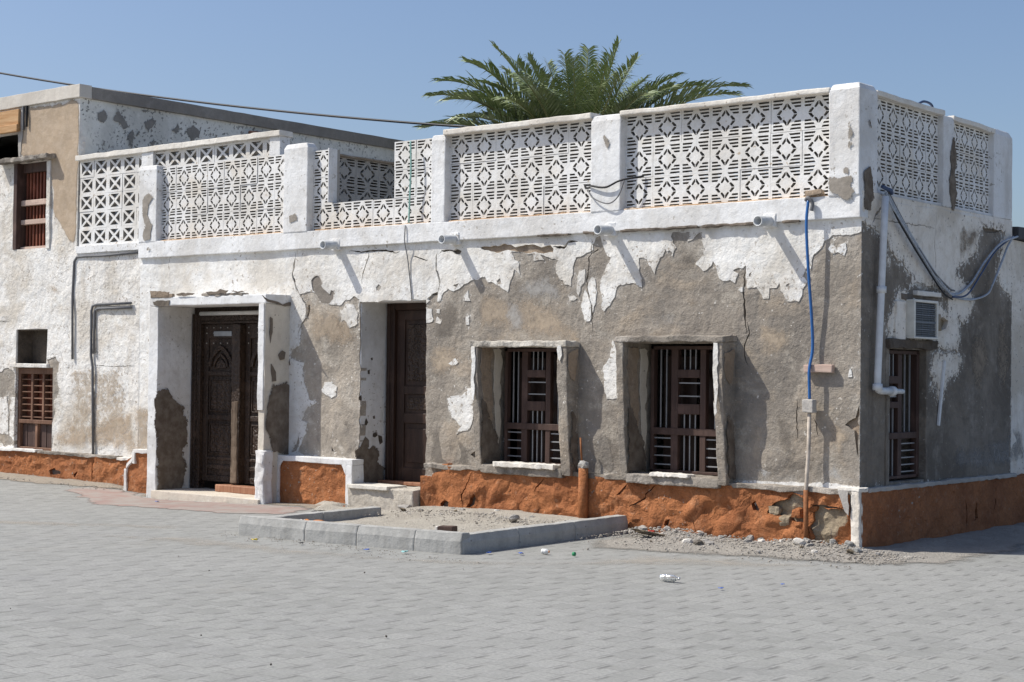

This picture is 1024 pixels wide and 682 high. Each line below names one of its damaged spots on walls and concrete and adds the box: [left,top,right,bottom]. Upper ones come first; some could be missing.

peeling [98,110,156,147]
peeling [172,124,200,141]
peeling [950,137,958,210]
peeling [142,193,153,250]
peeling [266,276,385,483]
peeling [425,167,1012,543]
peeling [154,388,188,490]